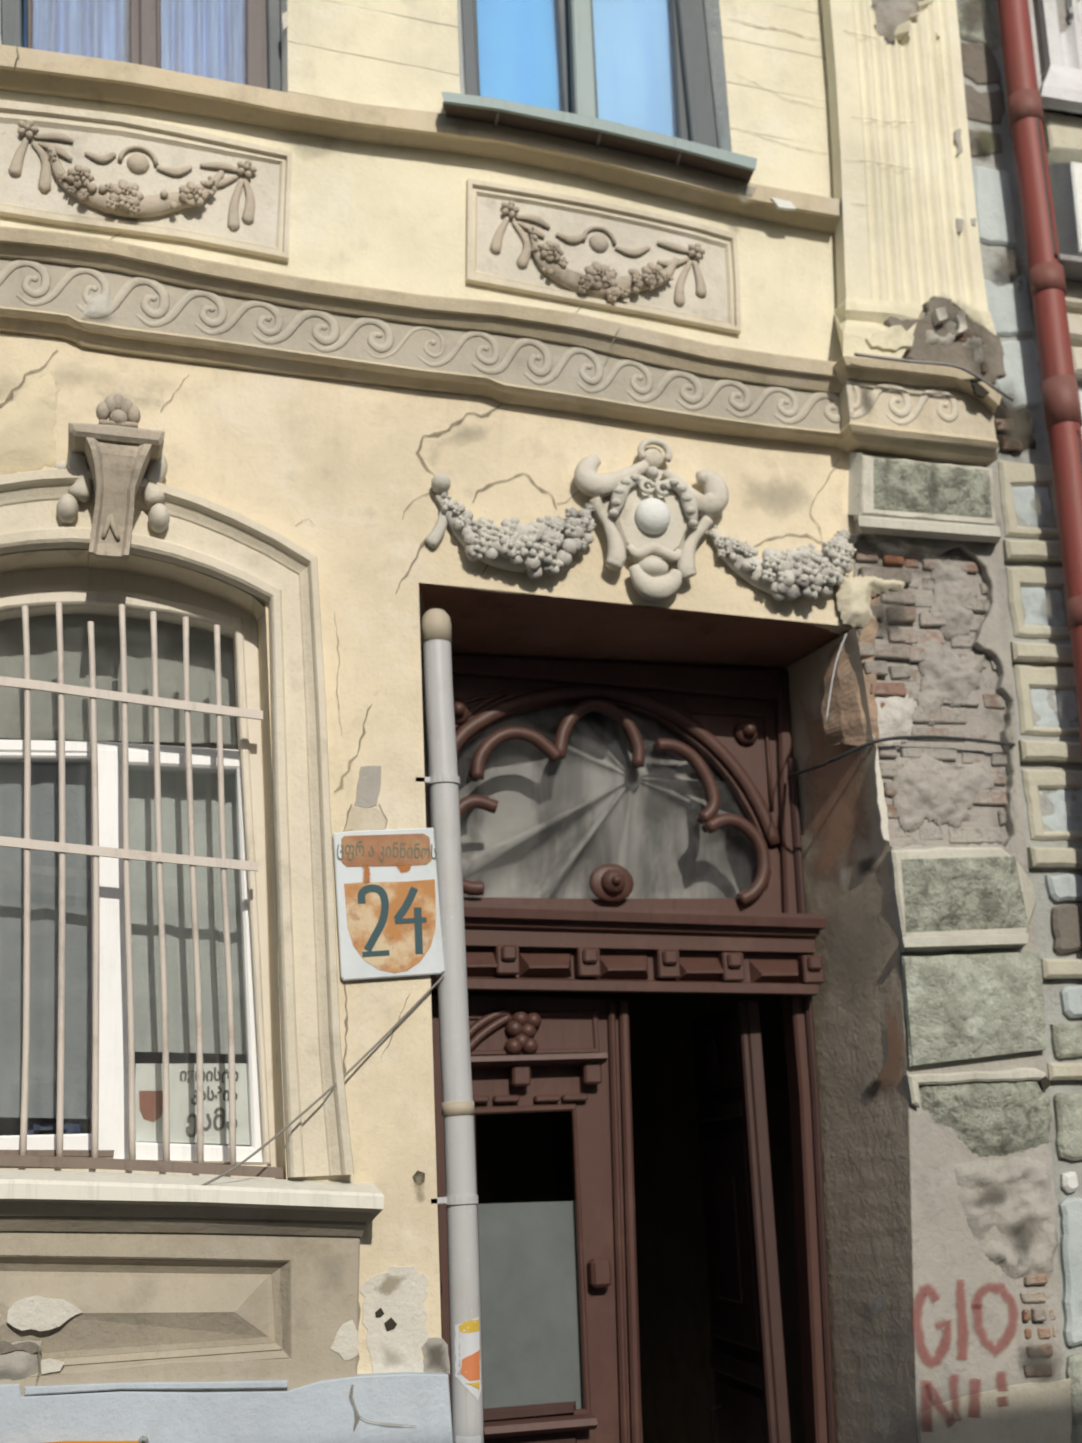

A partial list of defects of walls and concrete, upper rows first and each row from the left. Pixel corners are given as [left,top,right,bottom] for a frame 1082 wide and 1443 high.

flaking render [872,0,923,46]
crack [0,350,58,408]
crack [396,404,502,593]
crack [472,473,579,509]
crack [754,458,839,547]
flaking render [821,537,1008,848]
peeling [836,851,874,882]
peeling [0,1295,83,1382]
peeling [330,1266,450,1374]